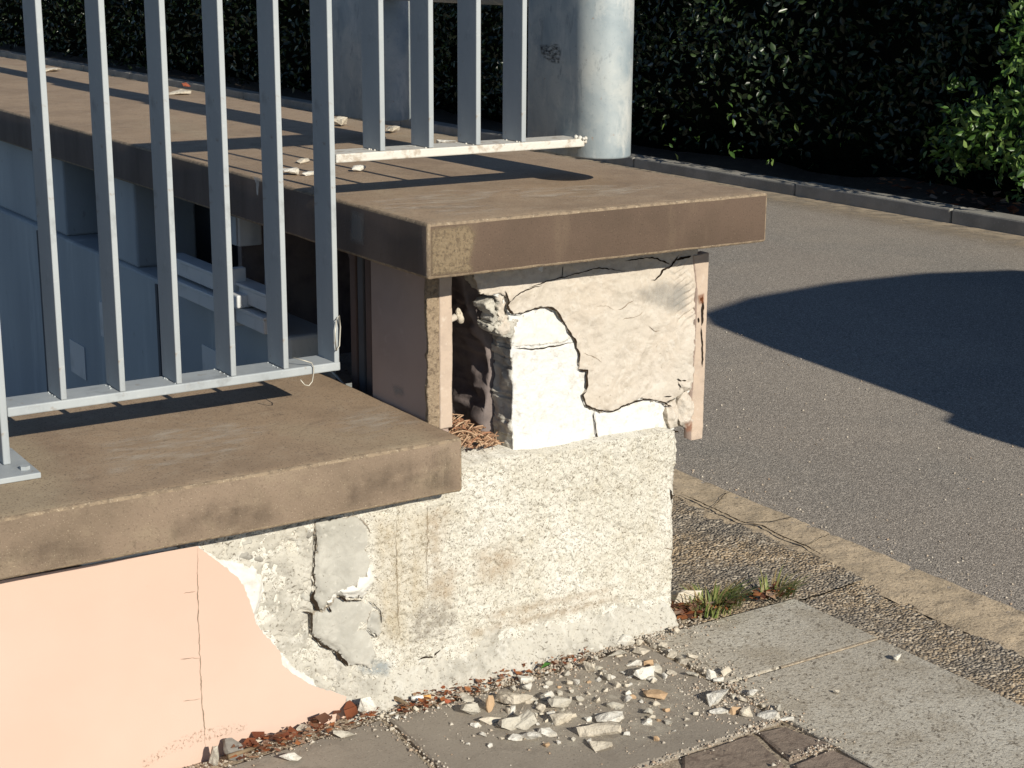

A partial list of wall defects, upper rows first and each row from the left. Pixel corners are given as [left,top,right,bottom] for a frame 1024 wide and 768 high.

spalling [473,293,694,450]
crack [505,255,704,437]
spalling [204,515,386,697]